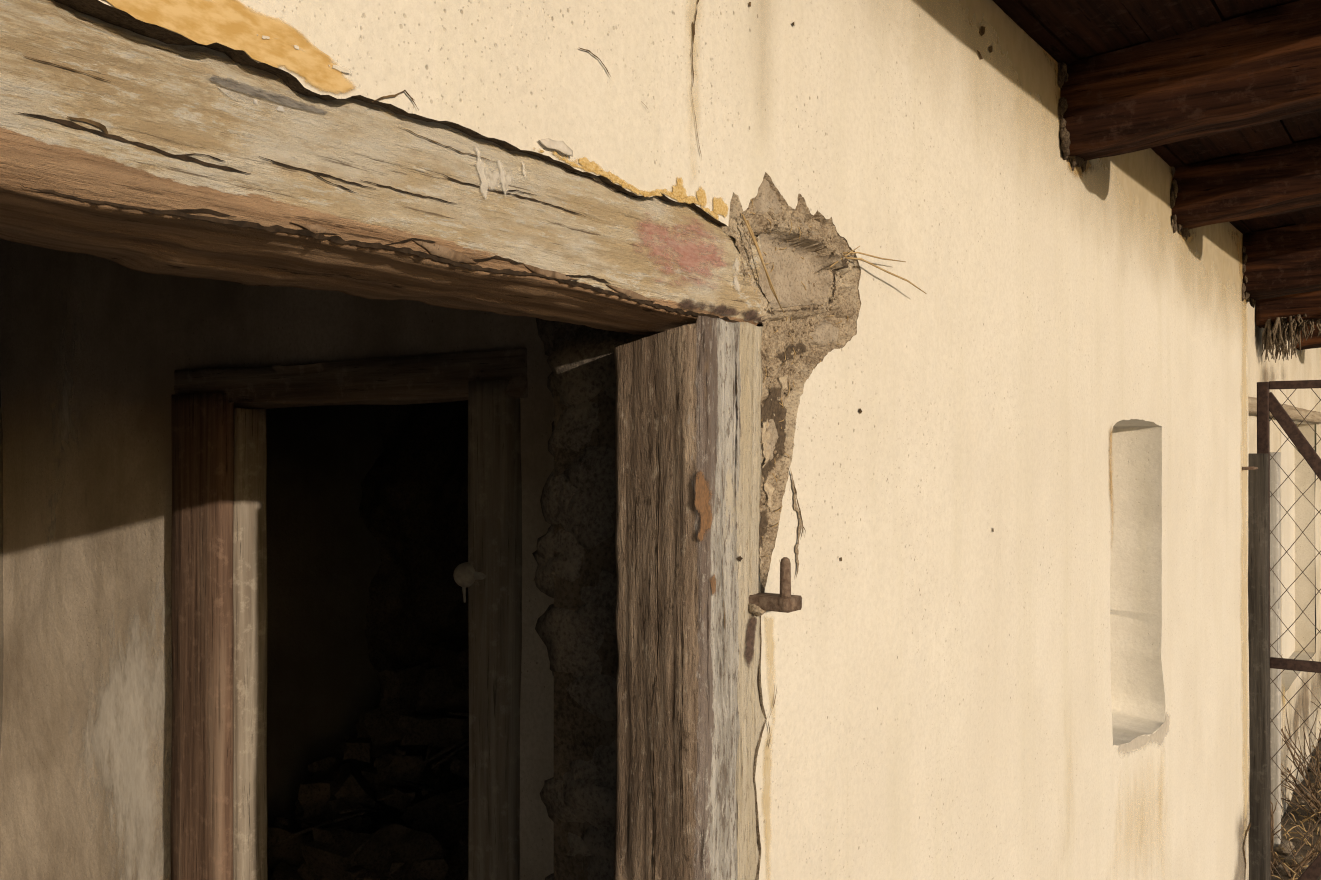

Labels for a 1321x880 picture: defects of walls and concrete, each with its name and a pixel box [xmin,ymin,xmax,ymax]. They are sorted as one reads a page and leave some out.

peeling [106,0,355,94]
spalling [210,75,327,114]
crack [691,0,702,158]
flaking render [539,138,860,579]
crack [722,558,777,880]